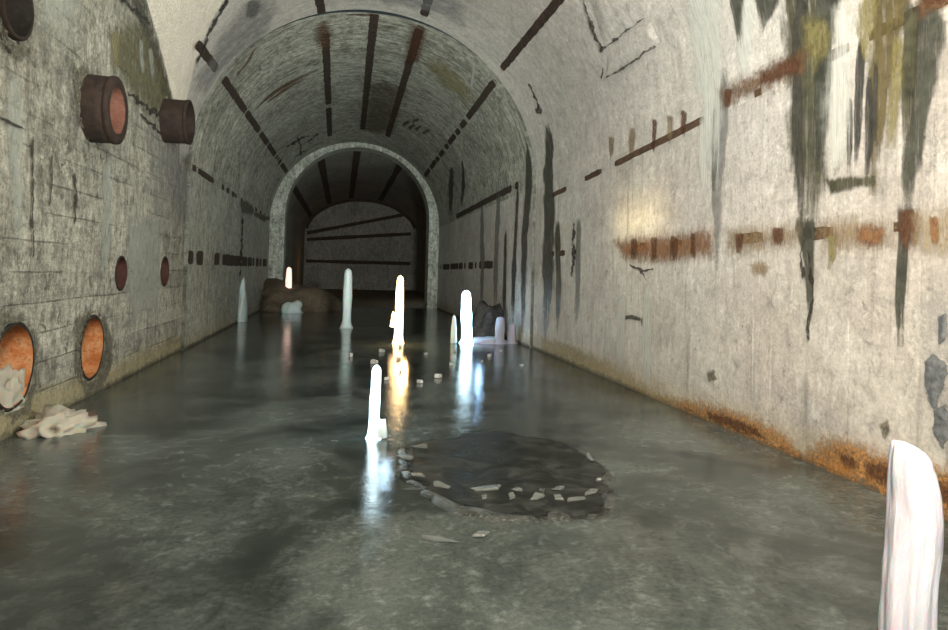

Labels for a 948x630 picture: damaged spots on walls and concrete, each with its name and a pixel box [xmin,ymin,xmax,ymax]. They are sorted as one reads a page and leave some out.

corrosion [720,52,805,106]
corrosion [609,110,704,166]
leakage [690,0,946,306]
corrosion [617,231,711,262]
leakage [895,207,911,333]
peeling [938,314,947,344]
corrosion [543,341,888,494]
peeling [924,355,948,448]
corrosion [933,467,948,518]